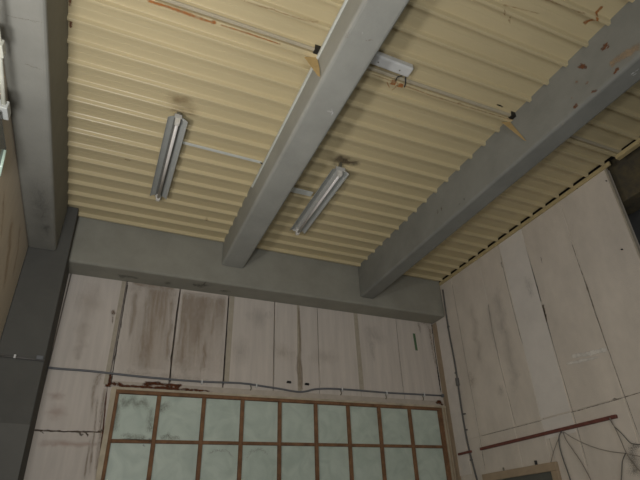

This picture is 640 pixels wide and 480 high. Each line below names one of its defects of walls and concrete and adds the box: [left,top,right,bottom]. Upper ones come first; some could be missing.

crack [34,428,103,436]
rust [99,374,209,455]